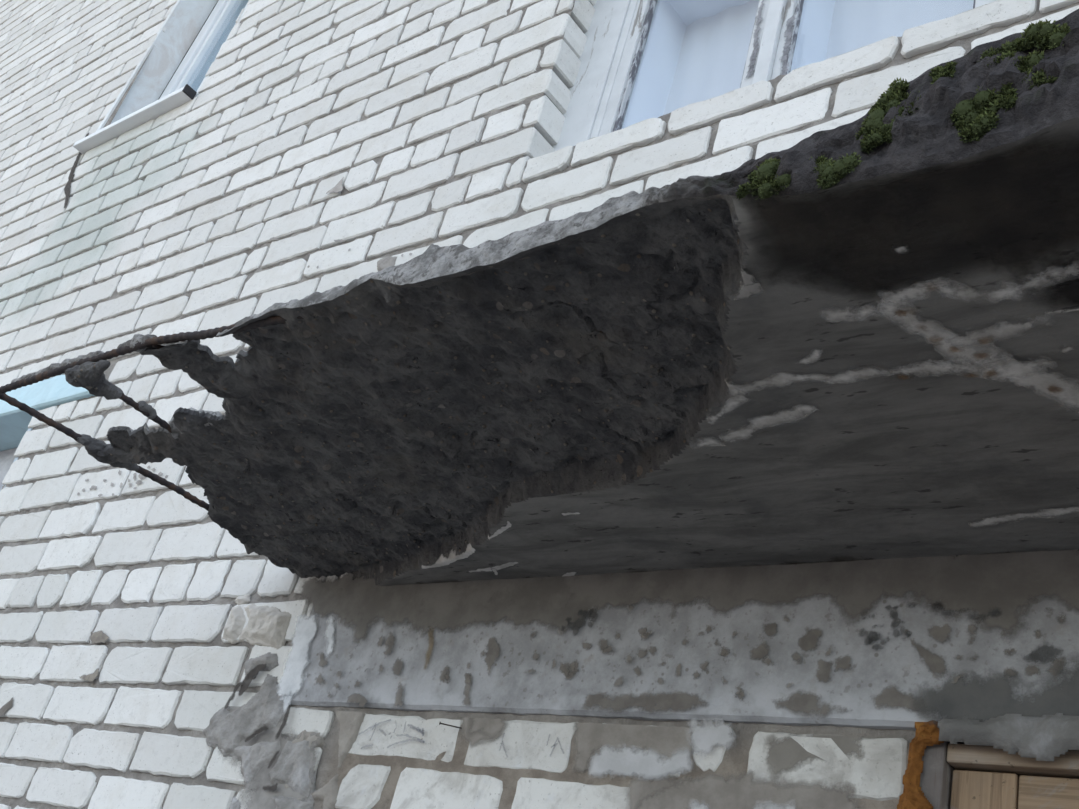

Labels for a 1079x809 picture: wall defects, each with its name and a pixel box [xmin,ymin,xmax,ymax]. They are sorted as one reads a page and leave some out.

peeling [746,1,764,78]
peeling [781,16,796,75]
spalling [0,194,761,585]
efflorescence [698,405,816,446]
leakage [799,350,820,364]
efflorescence [970,507,1079,526]
leakage [278,549,1079,722]
peeling [202,595,316,809]